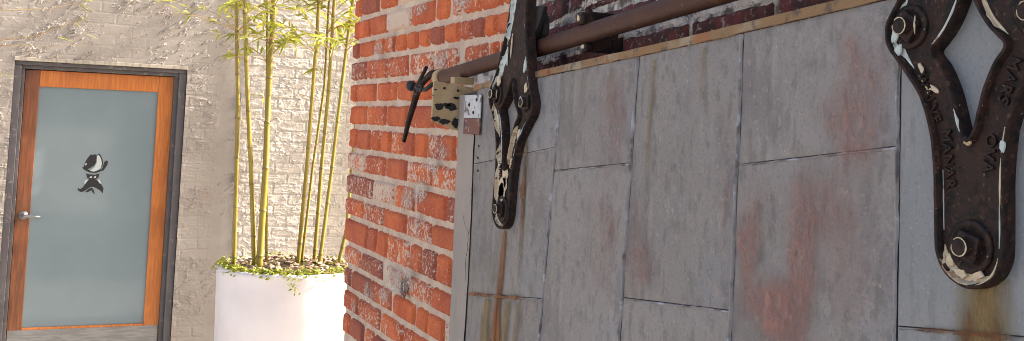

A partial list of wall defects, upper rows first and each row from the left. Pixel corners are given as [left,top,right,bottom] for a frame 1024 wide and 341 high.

rust [468,231,522,341]
rust [956,286,1005,341]